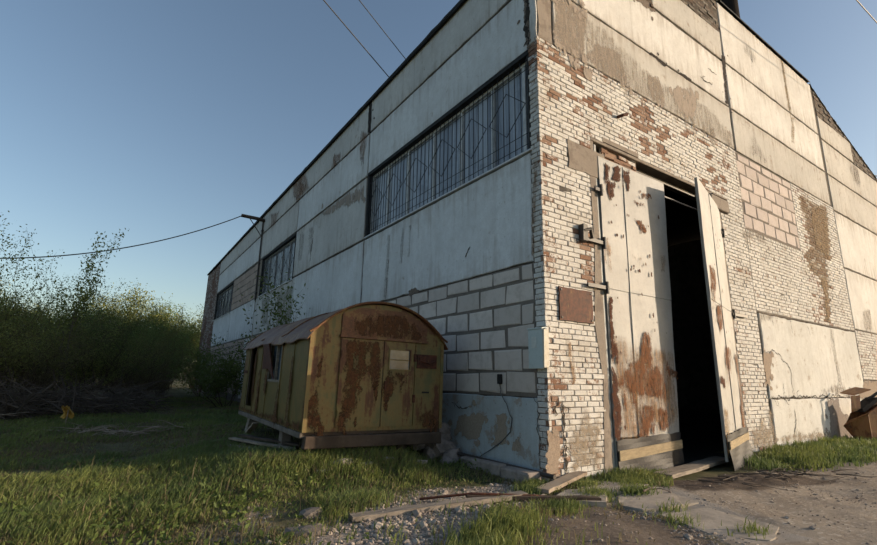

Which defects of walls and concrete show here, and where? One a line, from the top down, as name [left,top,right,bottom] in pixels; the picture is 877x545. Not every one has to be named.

spalling [517,0,531,48]
peeling [542,0,727,194]
flaking render [537,135,558,167]
corrosion [710,265,729,334]
flaking render [798,195,832,323]
corrosion [239,358,324,436]
corrosion [337,314,423,435]
peeling [447,400,521,452]
crack [532,397,571,474]
corrosion [609,296,678,441]
corrosion [720,347,745,453]
crack [769,349,847,434]